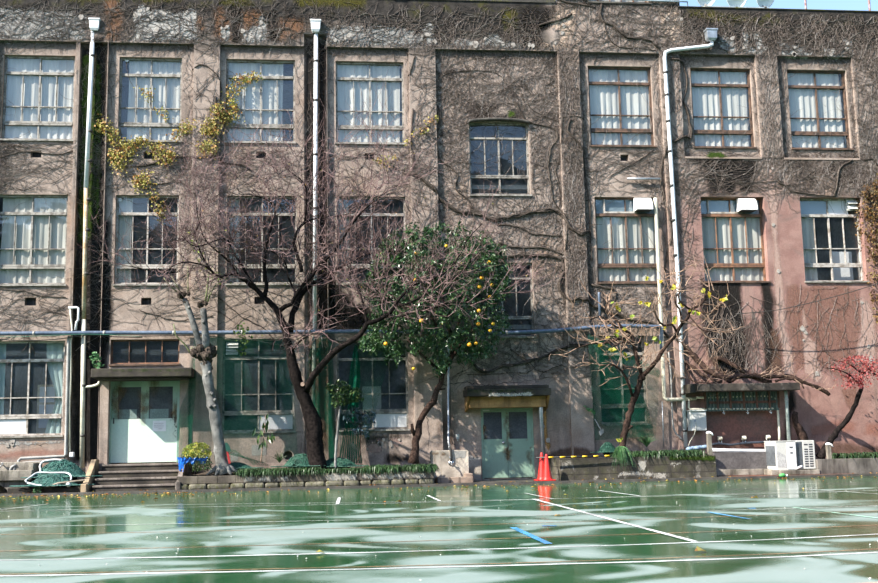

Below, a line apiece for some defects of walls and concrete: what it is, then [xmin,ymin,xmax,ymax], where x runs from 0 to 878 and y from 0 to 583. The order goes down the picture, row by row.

peeling [133,5,201,42]
peeling [241,17,267,43]
damp [695,159,757,195]
damp [701,283,749,376]